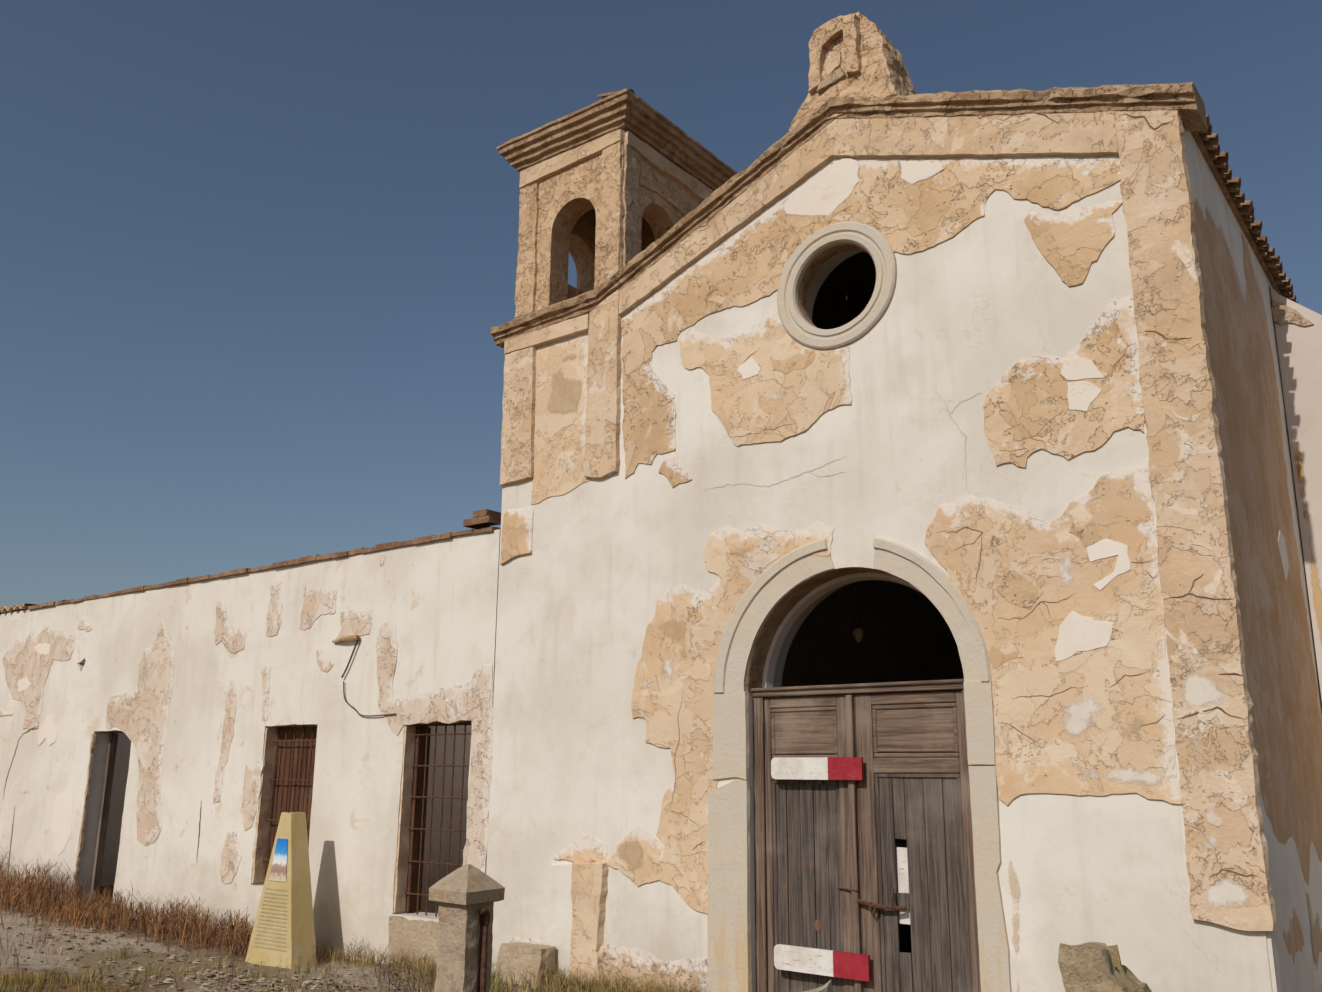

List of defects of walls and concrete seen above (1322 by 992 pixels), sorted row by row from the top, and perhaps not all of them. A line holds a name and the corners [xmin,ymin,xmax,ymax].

flaking render [621,156,1123,488]
flaking render [0,617,93,746]
flaking render [106,619,175,846]
flaking render [213,677,237,803]
flaking render [215,600,246,653]
flaking render [220,759,265,884]
flaking render [299,583,494,872]
flaking render [500,332,590,565]
flaking render [554,520,834,913]
crack [706,456,847,490]
flaking render [924,467,1182,805]
flaking render [983,197,1322,886]